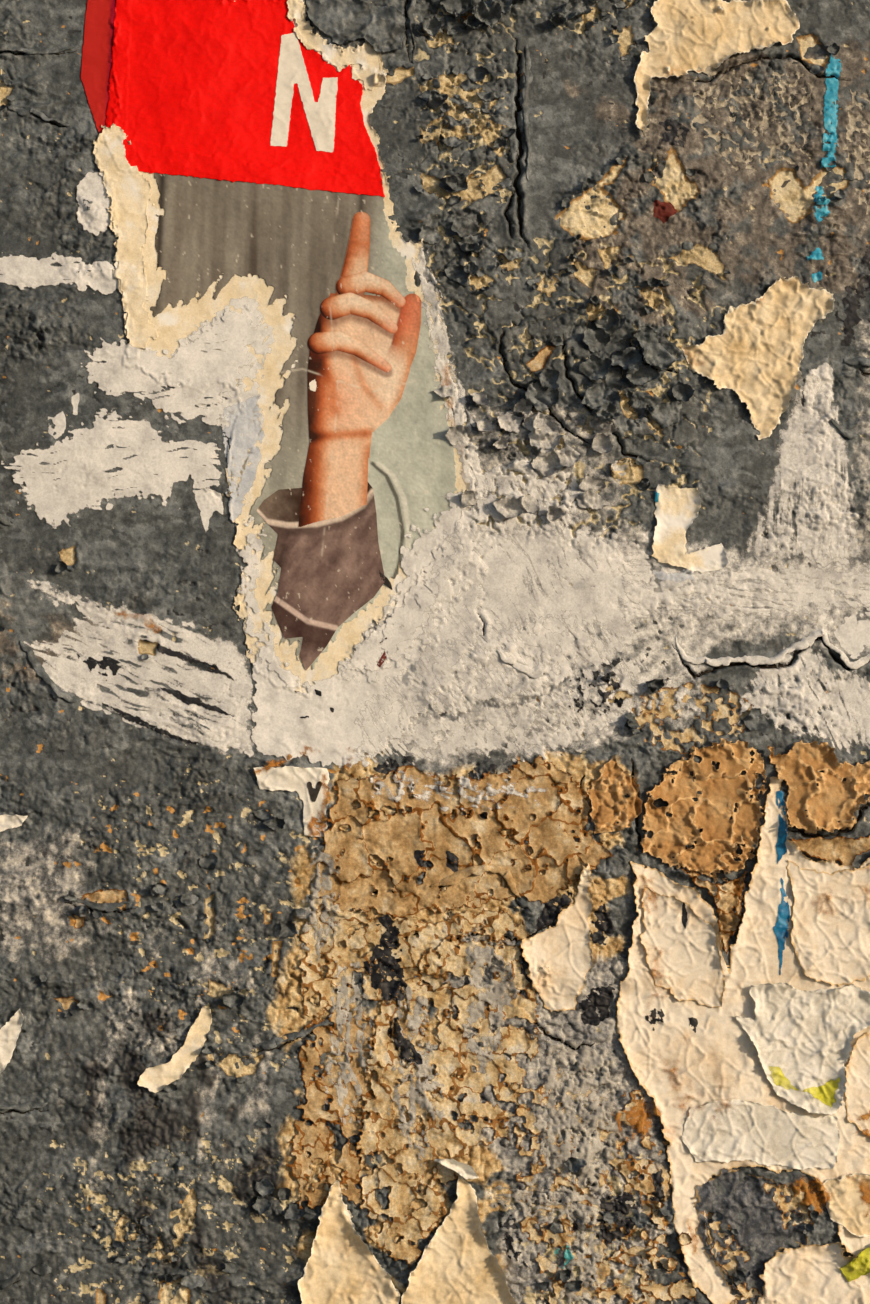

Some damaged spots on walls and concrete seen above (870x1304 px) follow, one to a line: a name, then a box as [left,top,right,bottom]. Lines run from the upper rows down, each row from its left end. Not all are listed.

crack [403,0,411,61]
crack [504,38,531,251]
peeling [691,33,870,224]
peeling [306,0,701,523]
peeling [669,241,731,280]
peeling [199,853,218,870]
peeling [149,883,216,943]
peeling [207,979,244,1008]
peeling [252,673,870,1304]
peeling [201,1045,264,1084]